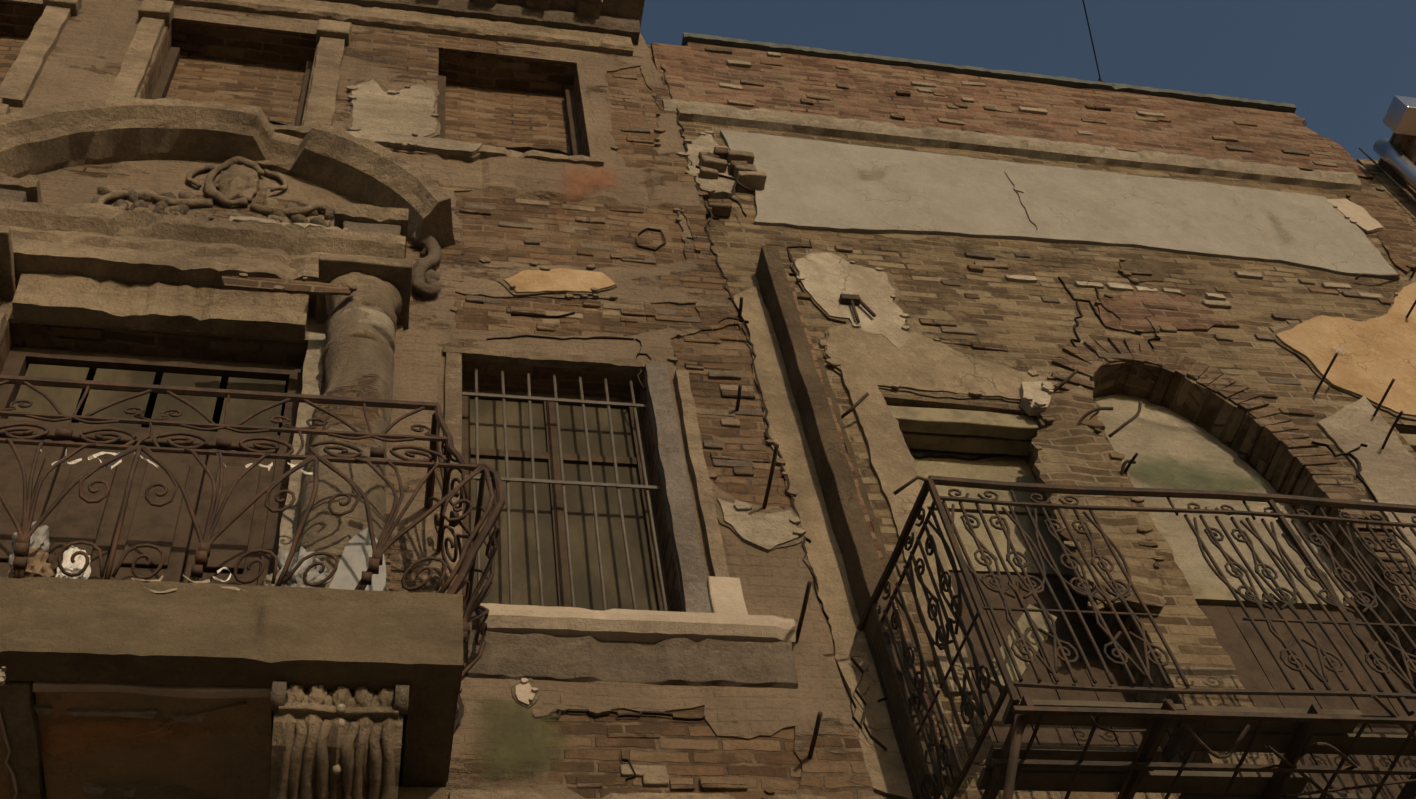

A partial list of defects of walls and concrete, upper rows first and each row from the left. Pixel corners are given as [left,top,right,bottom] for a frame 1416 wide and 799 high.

peeling [345,78,483,163]
spalling [454,130,737,296]
crack [1005,169,1037,233]
crack [1058,276,1161,349]
peeling [1269,177,1416,422]
spalling [667,326,806,553]
spalling [790,253,1166,617]
spalling [511,678,802,799]
crack [844,656,887,751]